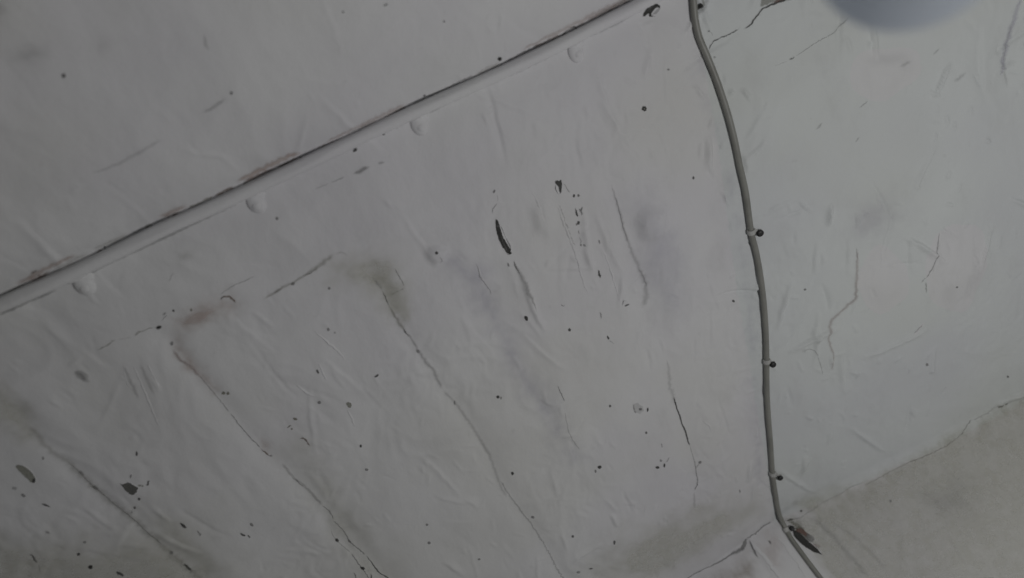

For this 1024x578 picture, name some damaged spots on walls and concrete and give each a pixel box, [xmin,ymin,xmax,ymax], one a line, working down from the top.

crack [710,0,786,47]
crack [674,399,690,444]